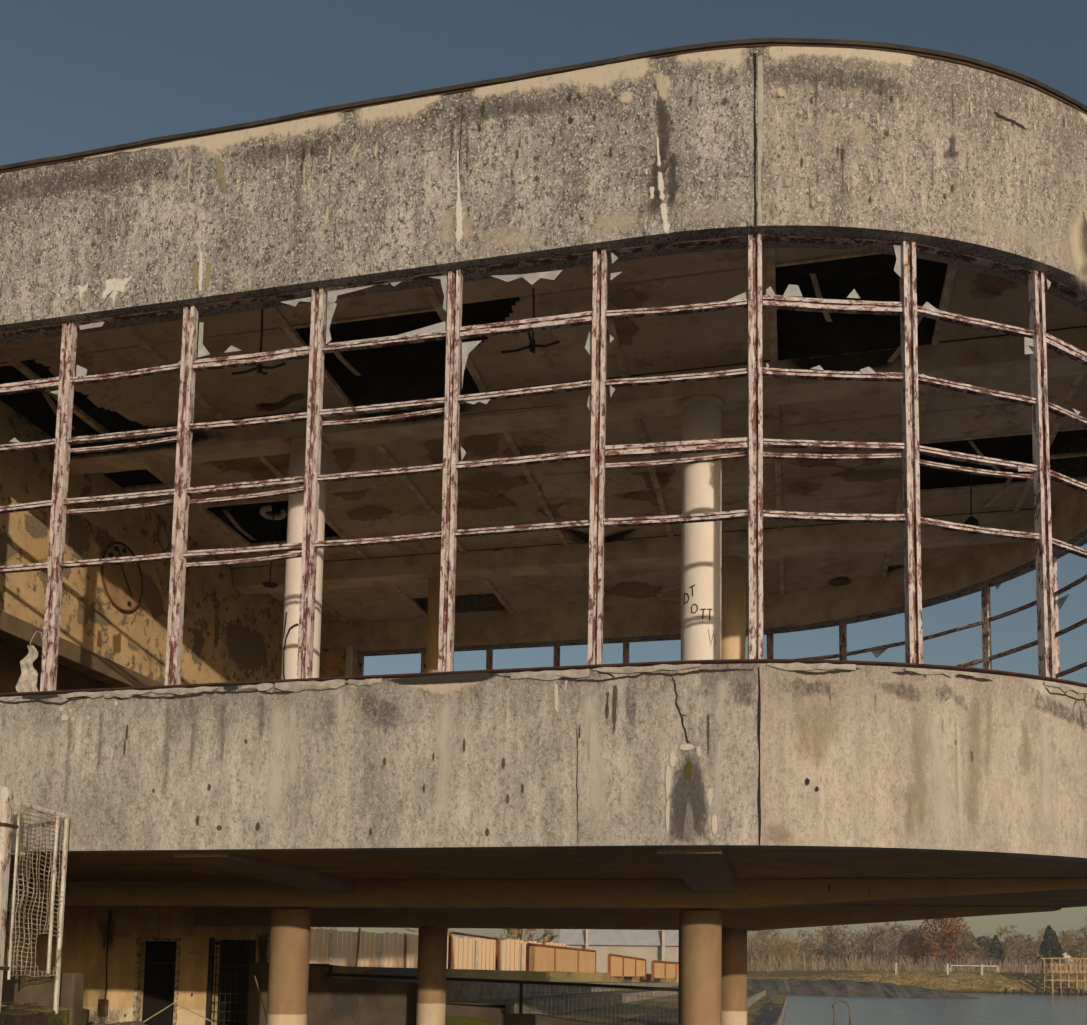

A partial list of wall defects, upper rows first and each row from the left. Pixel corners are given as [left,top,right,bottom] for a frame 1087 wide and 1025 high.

leakage [443,126,471,252]
leakage [645,97,678,234]
peeling [0,514,49,563]
peeling [63,514,118,580]
rust [97,631,121,654]
peeling [191,612,272,677]
leakage [605,685,618,732]
crack [558,669,753,744]
crack [789,667,860,675]
crack [892,672,992,682]
crack [1045,687,1087,708]
leakage [665,684,725,840]